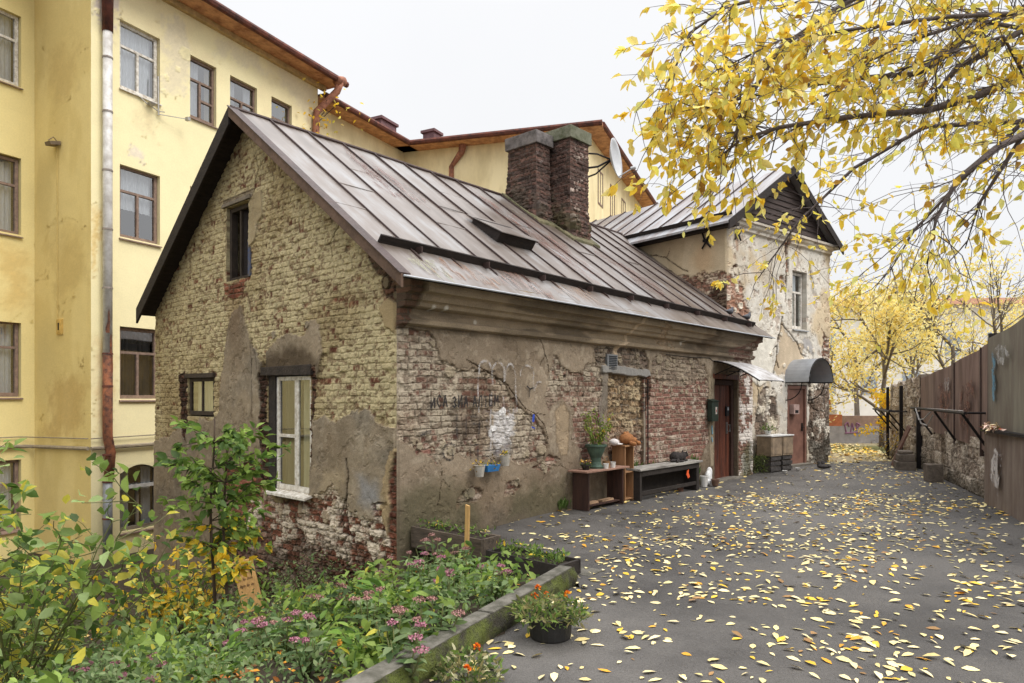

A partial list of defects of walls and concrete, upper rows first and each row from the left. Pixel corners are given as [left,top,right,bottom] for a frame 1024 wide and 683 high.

flaking render [679,264,750,316]
rust [91,310,120,434]
spalling [218,256,559,606]
crack [465,358,572,482]
flaking render [643,341,710,465]
flaking render [728,322,831,476]